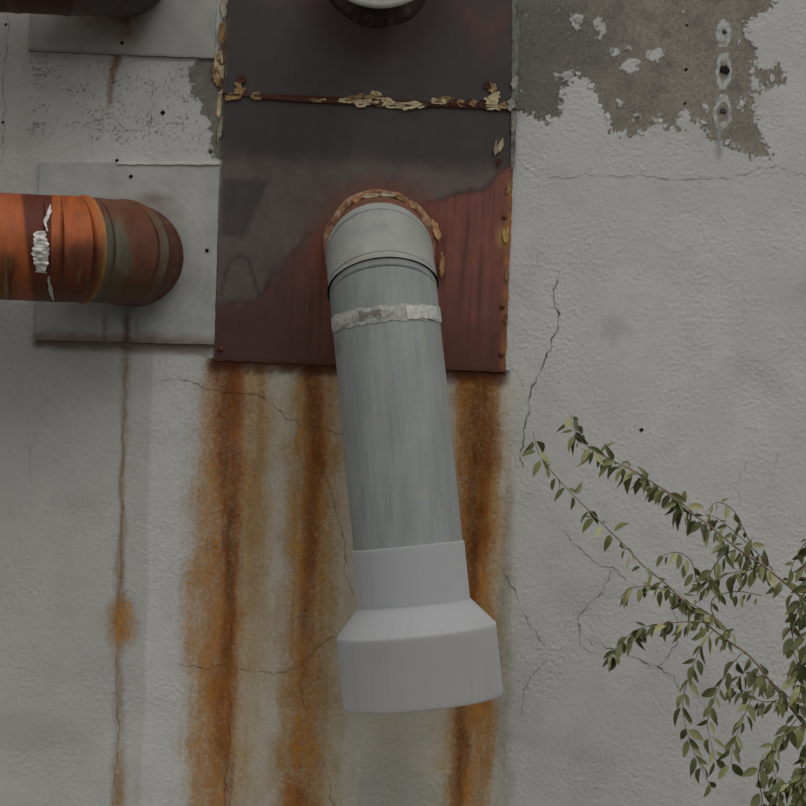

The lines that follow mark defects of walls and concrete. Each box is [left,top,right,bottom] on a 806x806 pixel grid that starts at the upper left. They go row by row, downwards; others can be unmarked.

peeling [189,0,787,161]
peeling [493,139,504,166]
crack [520,283,560,468]
rust [185,358,337,806]
rust [446,370,507,613]
rust [454,701,493,806]